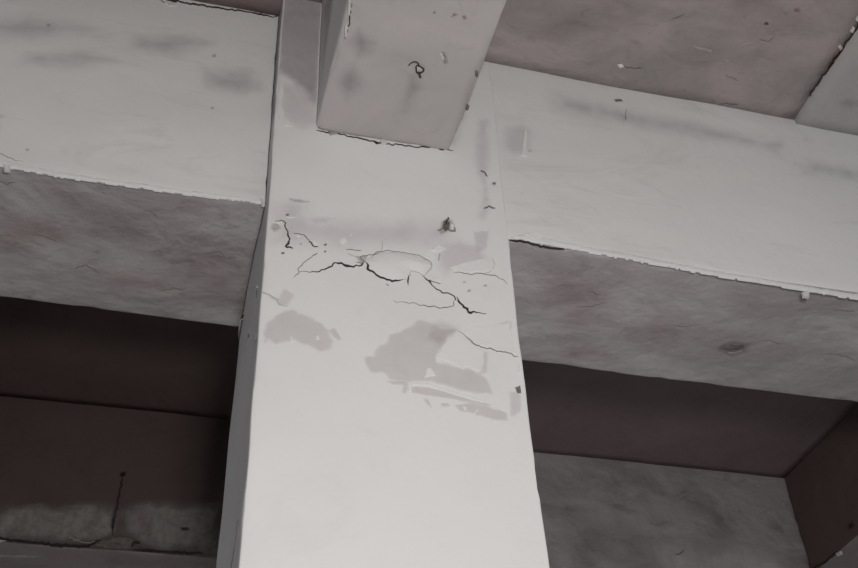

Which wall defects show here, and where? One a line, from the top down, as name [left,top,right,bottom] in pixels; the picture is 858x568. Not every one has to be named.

crack [161,0,277,18]
crack [810,16,858,97]
crack [275,214,508,314]
crack [110,473,125,534]
spalling [0,537,203,555]